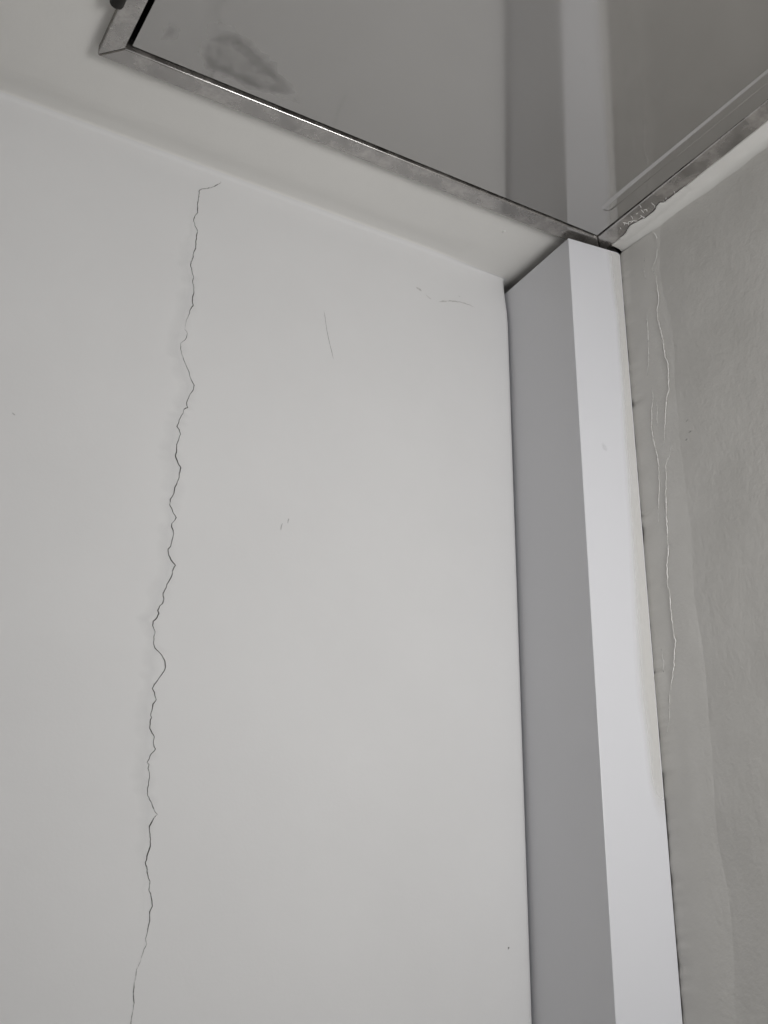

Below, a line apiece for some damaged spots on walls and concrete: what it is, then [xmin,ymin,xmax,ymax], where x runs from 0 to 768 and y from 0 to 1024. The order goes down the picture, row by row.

crack [131,183,220,1017]